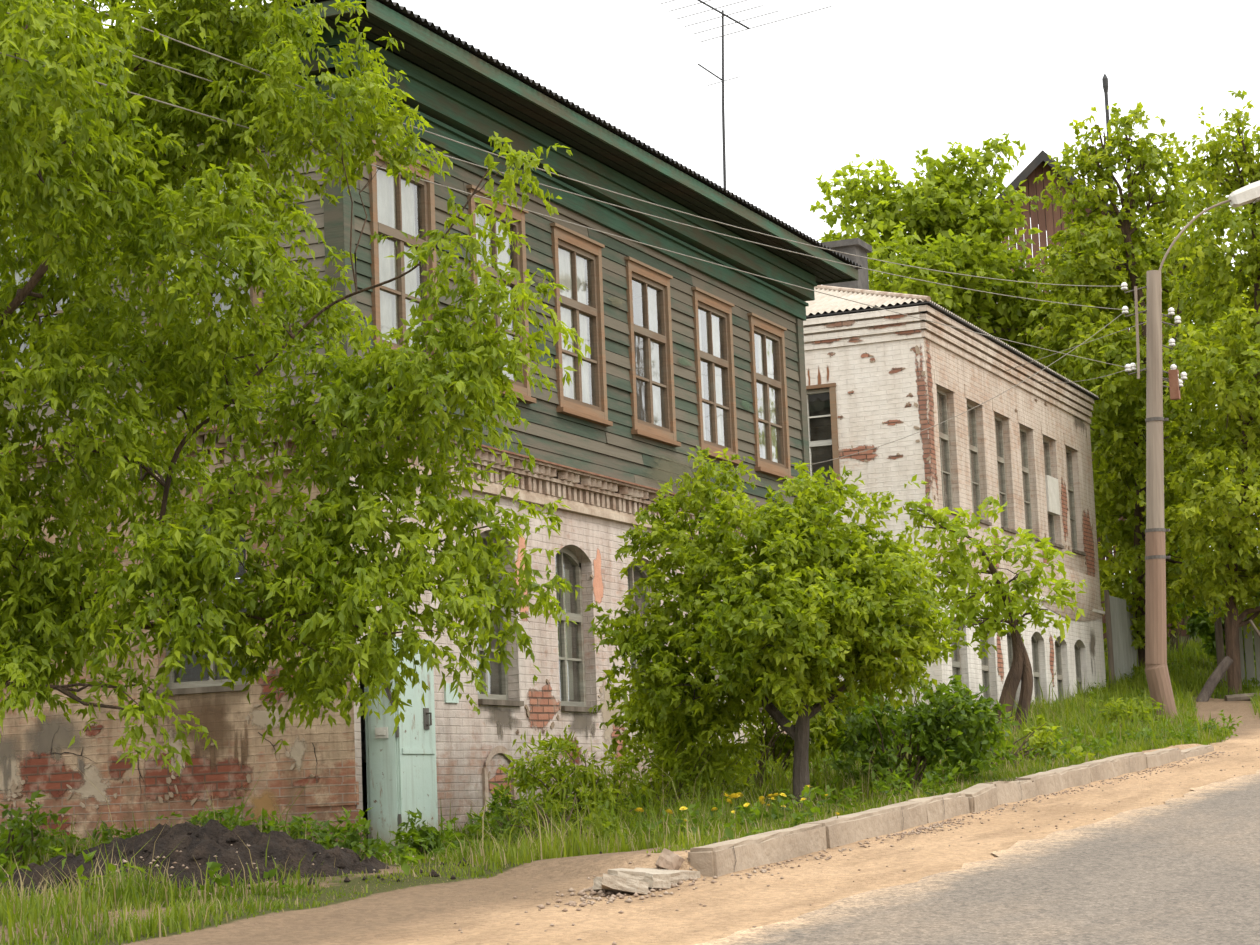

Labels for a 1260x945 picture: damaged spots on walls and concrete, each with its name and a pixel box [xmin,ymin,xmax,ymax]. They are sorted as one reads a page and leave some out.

spalling [813,313,938,507]
flaking render [590,549,603,603]
spalling [1061,477,1095,577]
spalling [516,679,561,734]
spalling [0,729,252,840]